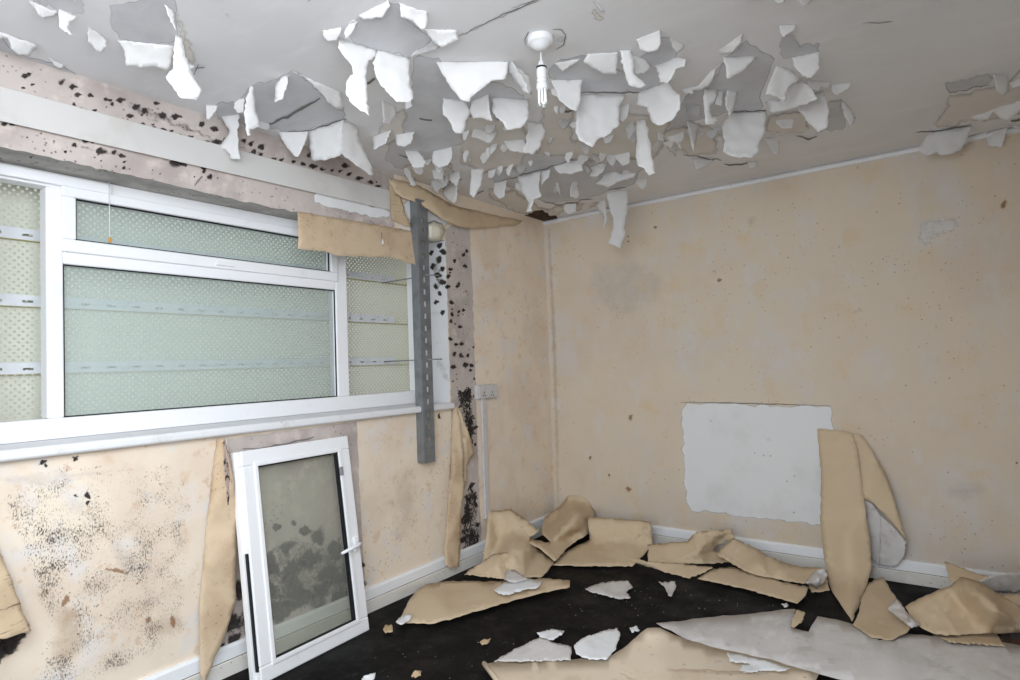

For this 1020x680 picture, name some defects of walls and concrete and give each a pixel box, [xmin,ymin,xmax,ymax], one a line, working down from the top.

crack [460,0,539,36]
water stain [62,140,126,170]
water stain [59,79,225,145]
water stain [241,139,380,187]
peeling [0,0,855,248]
peeling [917,71,1020,155]
water stain [429,233,469,328]
flaking render [404,201,482,550]
water stain [448,337,478,446]
flaking render [227,422,365,587]
flaking render [258,454,347,626]
water stain [0,633,26,662]